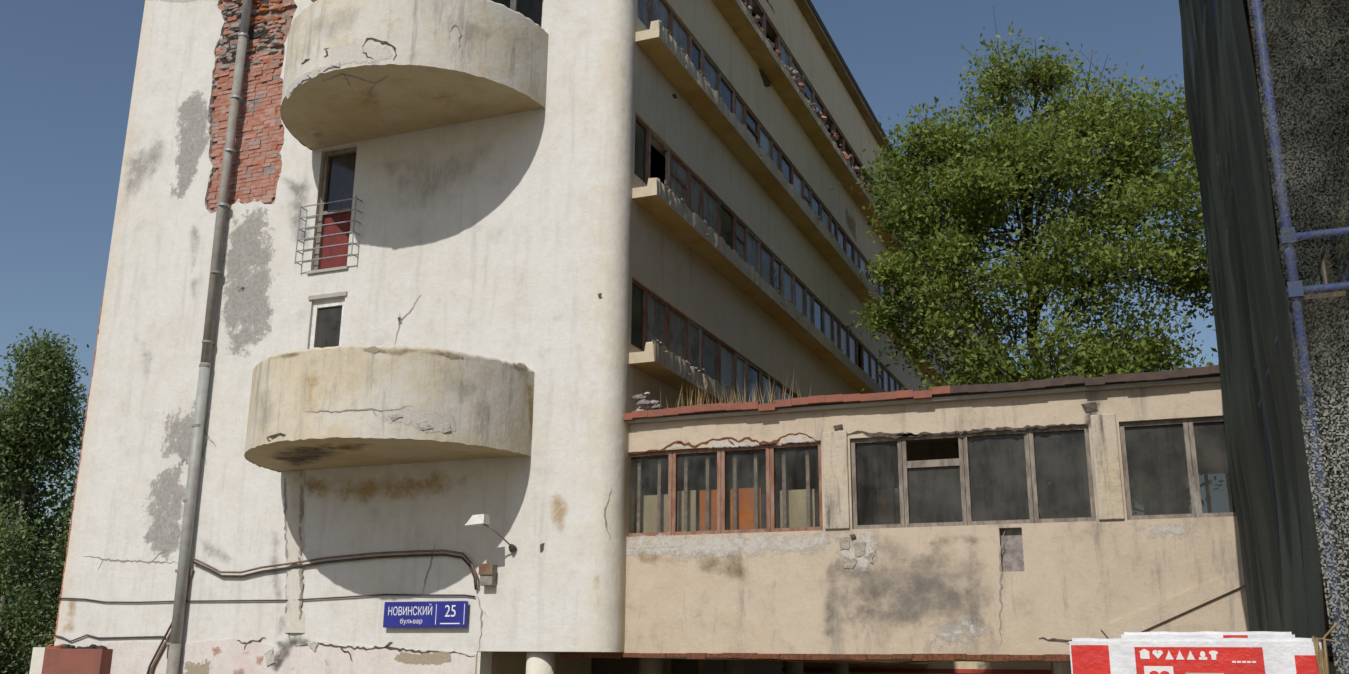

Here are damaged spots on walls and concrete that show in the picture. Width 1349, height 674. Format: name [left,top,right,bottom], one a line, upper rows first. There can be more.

flaking render [205,0,393,214]
leakage [224,207,273,356]
crack [83,549,177,569]
leakage [144,403,195,560]
leakage [276,447,354,465]
crack [267,406,404,441]
crack [237,473,487,662]
spalling [835,532,878,572]